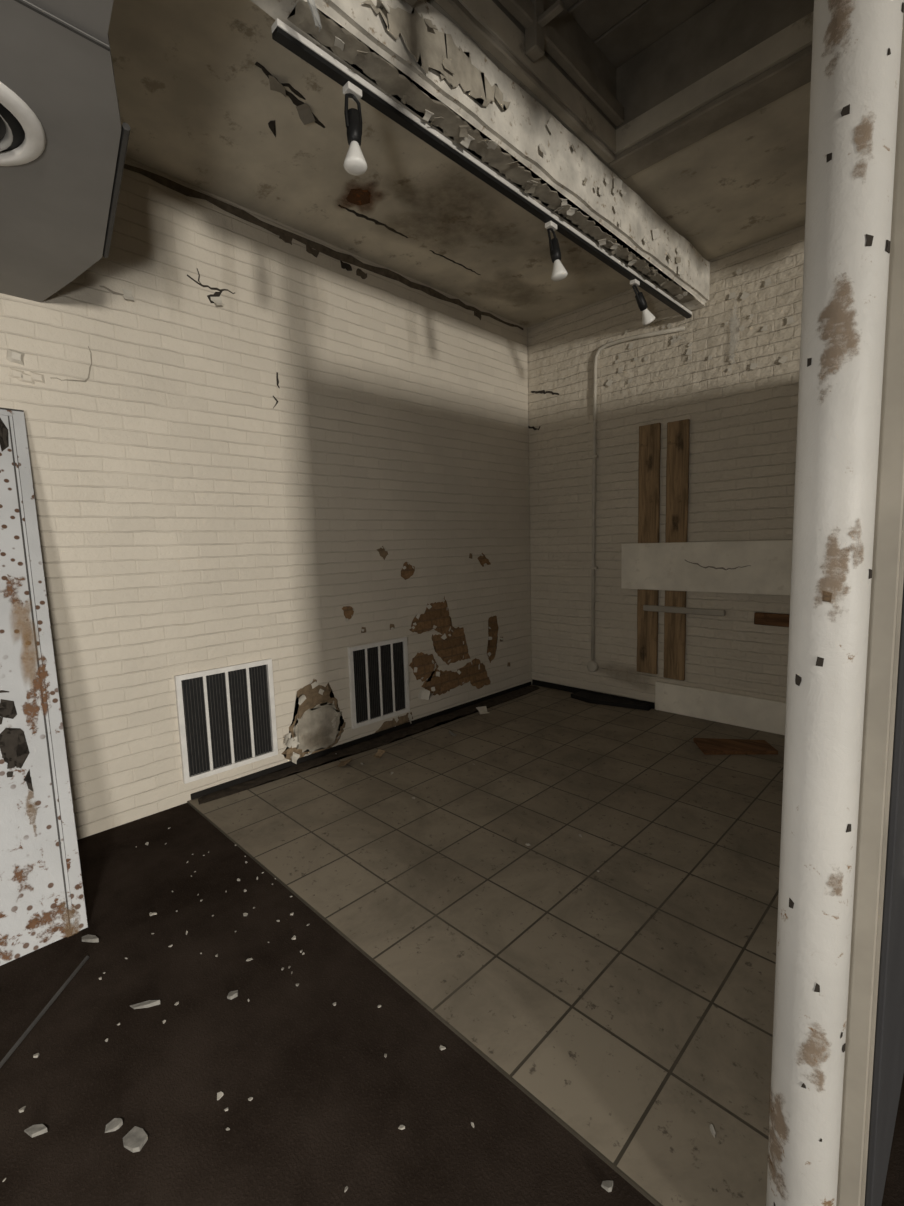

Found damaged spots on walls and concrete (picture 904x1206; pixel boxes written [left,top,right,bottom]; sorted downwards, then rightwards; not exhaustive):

peeling [287,0,710,303]
rust [819,280,859,379]
rust [816,521,863,603]
rust [3,575,50,734]
peeling [409,596,510,700]
rust [26,791,37,835]
rust [12,865,34,898]
rust [0,935,12,960]
rust [27,903,80,943]